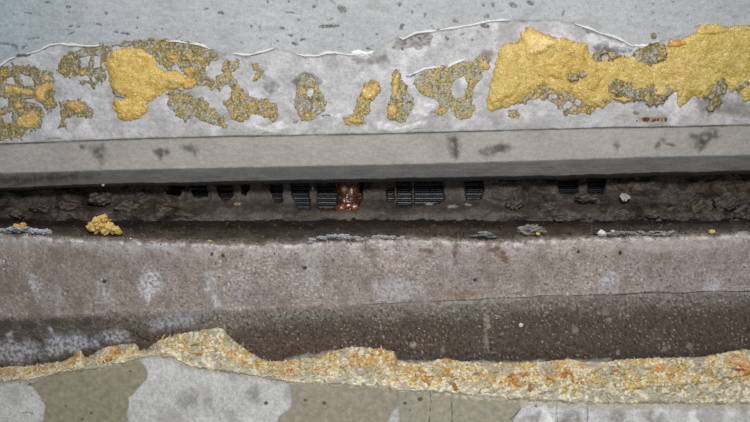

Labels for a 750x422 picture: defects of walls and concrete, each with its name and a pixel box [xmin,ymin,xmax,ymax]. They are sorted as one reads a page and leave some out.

peeling [0,27,381,142]
peeling [375,55,491,130]
peeling [508,86,596,119]
peeling [567,70,587,82]
peeling [575,23,673,115]
peeling [703,77,750,112]
damp [0,327,129,366]
spalling [0,328,750,410]